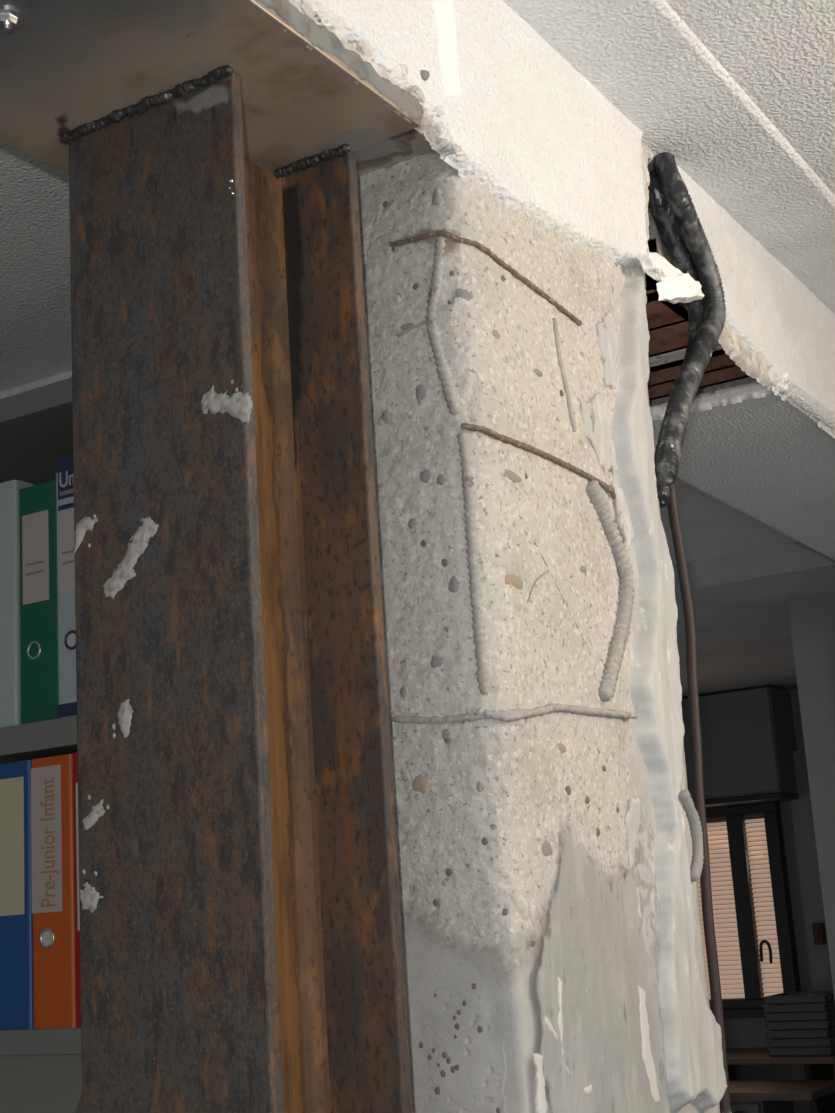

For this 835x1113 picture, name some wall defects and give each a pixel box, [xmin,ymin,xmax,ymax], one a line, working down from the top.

rust [252,349,304,1113]
spalling [289,0,727,1113]
spalling [690,319,788,412]